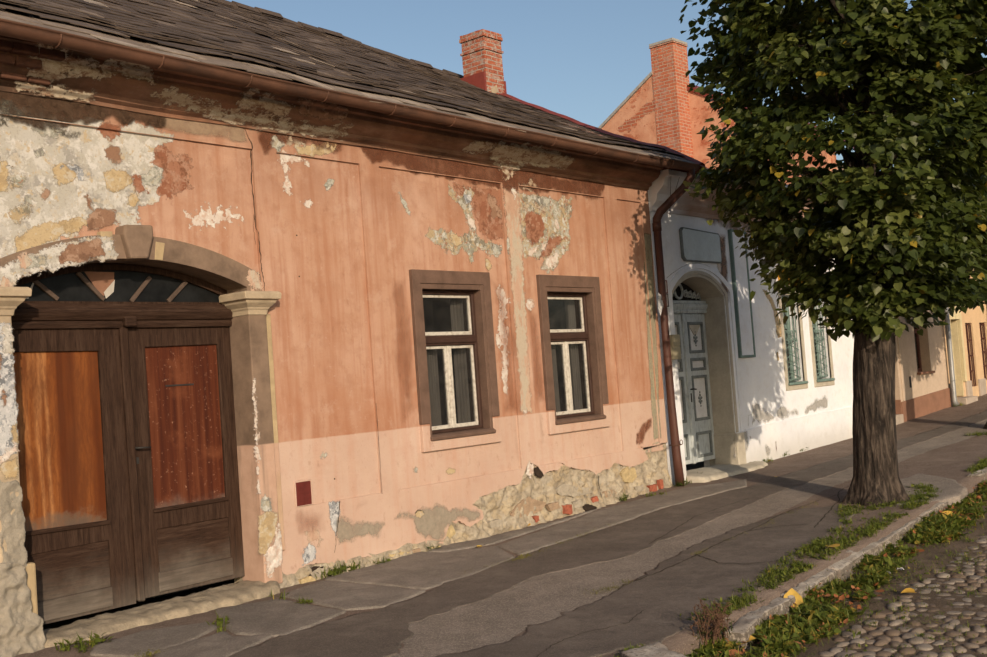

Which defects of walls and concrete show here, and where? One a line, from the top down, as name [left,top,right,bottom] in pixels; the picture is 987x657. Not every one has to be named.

peeling [0,110,194,287]
spalling [0,35,354,208]
peeling [183,202,246,231]
peeling [425,139,575,414]
peeling [0,322,28,567]
spalling [252,378,673,589]